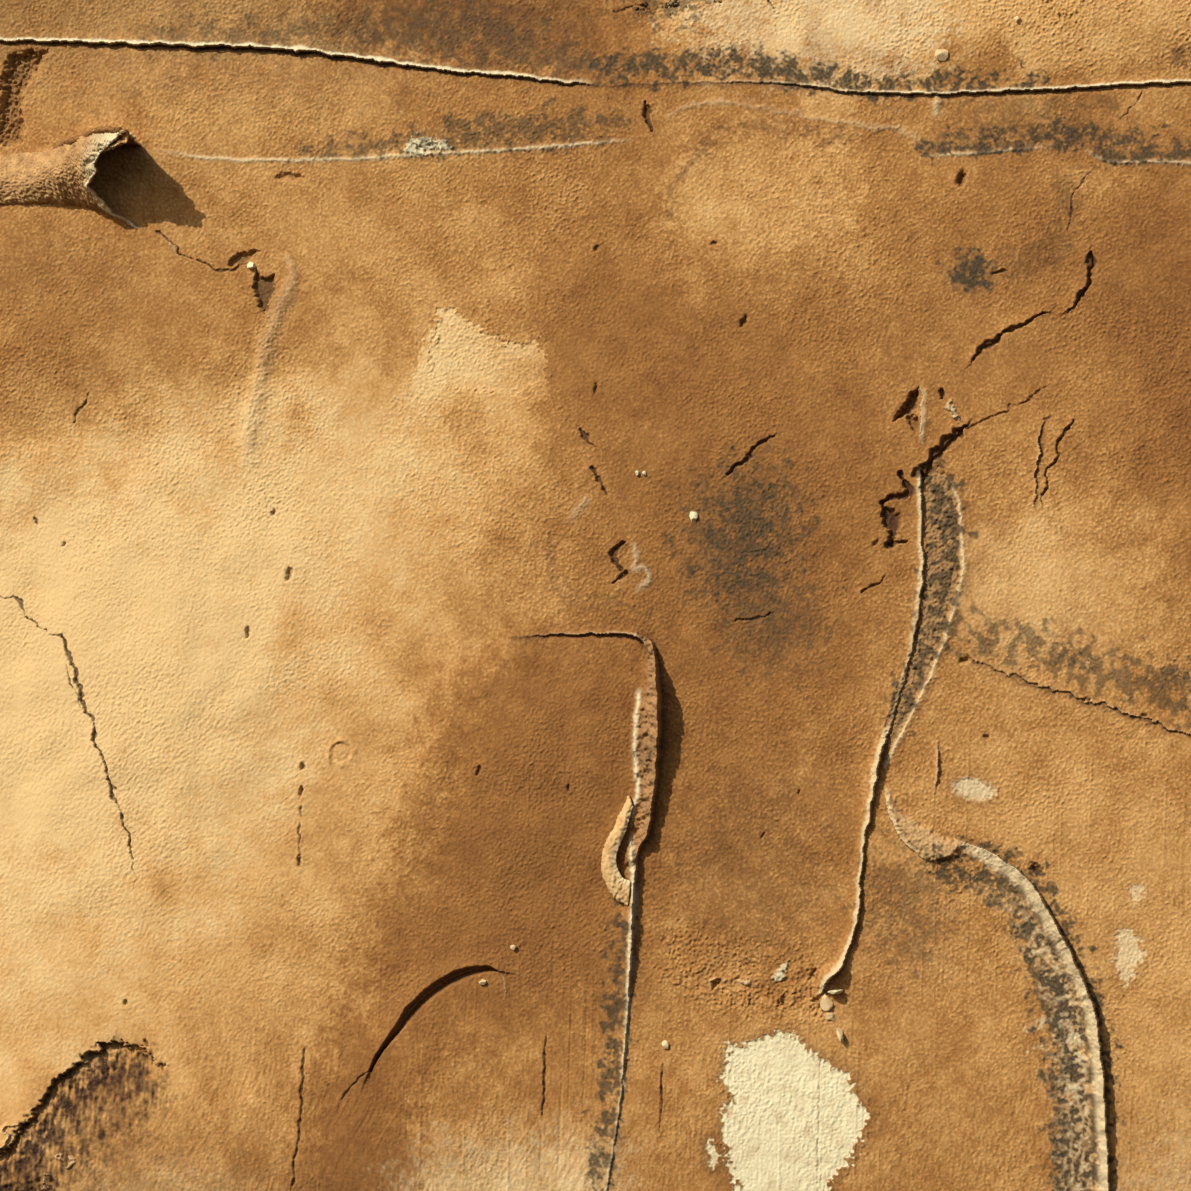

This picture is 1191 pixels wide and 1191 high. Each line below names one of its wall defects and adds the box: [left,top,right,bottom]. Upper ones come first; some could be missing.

peeling [0,36,634,229]
crack [640,101,656,135]
crack [1116,89,1145,124]
crack [970,170,1102,364]
crack [859,385,1076,595]
crack [0,593,138,884]
peeling [519,457,1113,1191]
spalling [0,997,193,1191]
crack [289,1047,307,1191]
crack [337,963,507,1117]